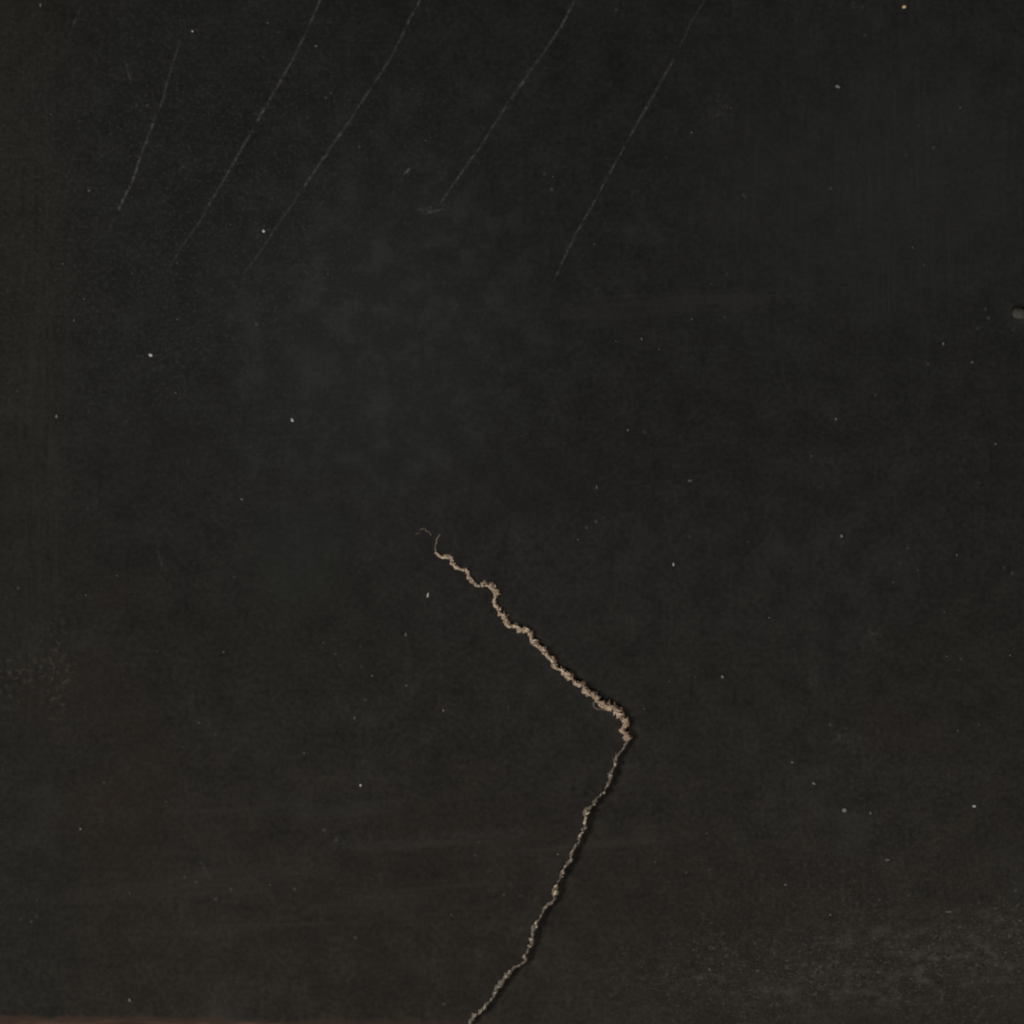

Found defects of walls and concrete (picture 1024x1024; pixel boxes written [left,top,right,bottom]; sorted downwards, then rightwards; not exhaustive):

crack [417,528,632,1024]